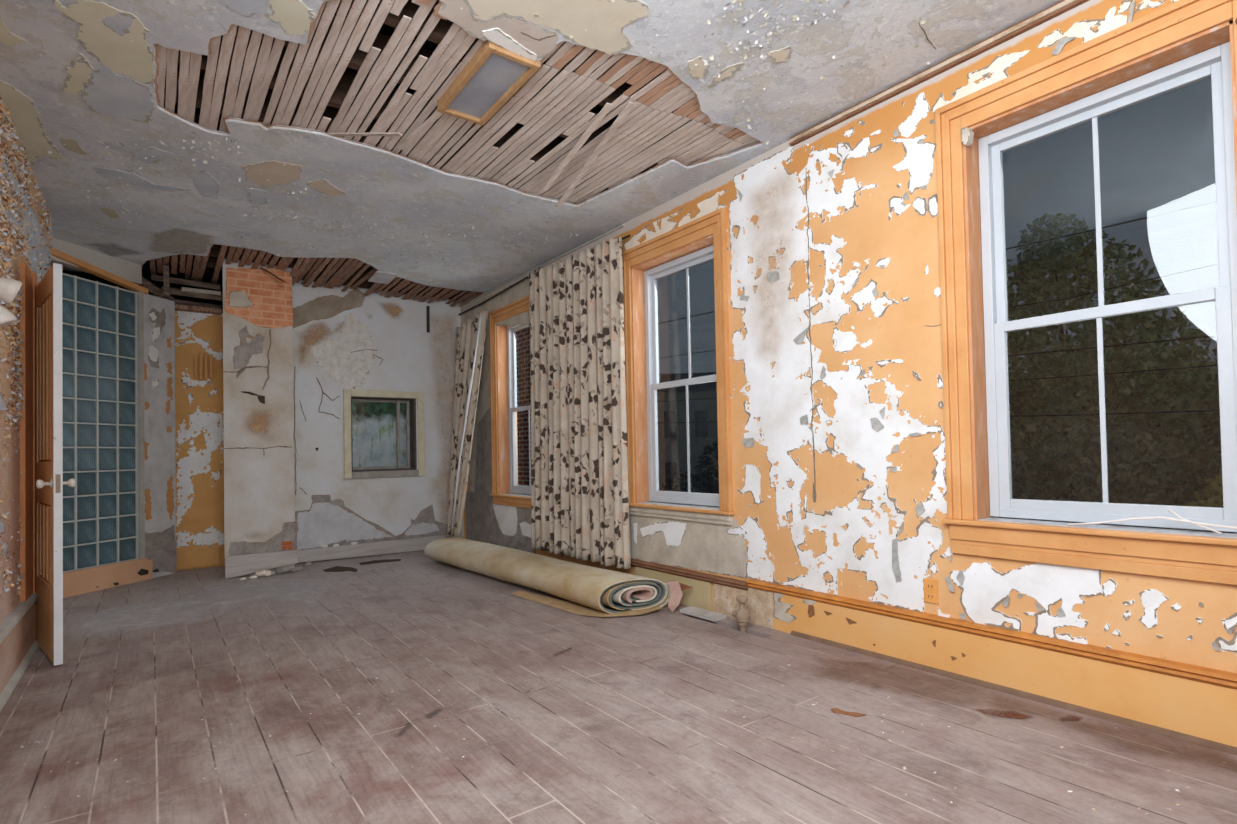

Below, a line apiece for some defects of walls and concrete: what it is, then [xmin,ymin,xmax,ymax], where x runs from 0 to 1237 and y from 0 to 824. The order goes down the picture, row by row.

peeling [0,0,1181,649]
crack [223,329,340,495]
peeling [1212,612,1237,655]